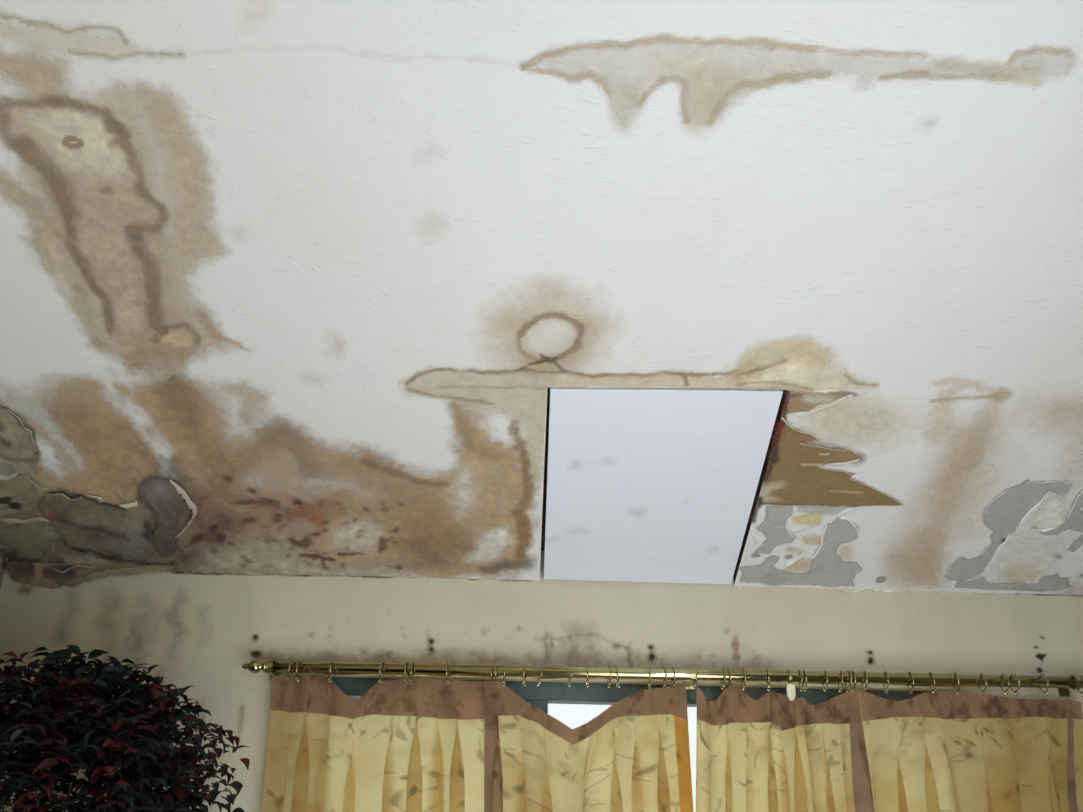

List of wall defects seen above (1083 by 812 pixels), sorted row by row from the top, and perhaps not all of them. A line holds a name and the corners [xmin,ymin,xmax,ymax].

damp [523,36,1073,123]
damp [0,55,752,579]
peeling [0,404,174,592]
peeling [740,505,862,587]
damp [895,528,943,582]
peeling [945,480,1083,592]